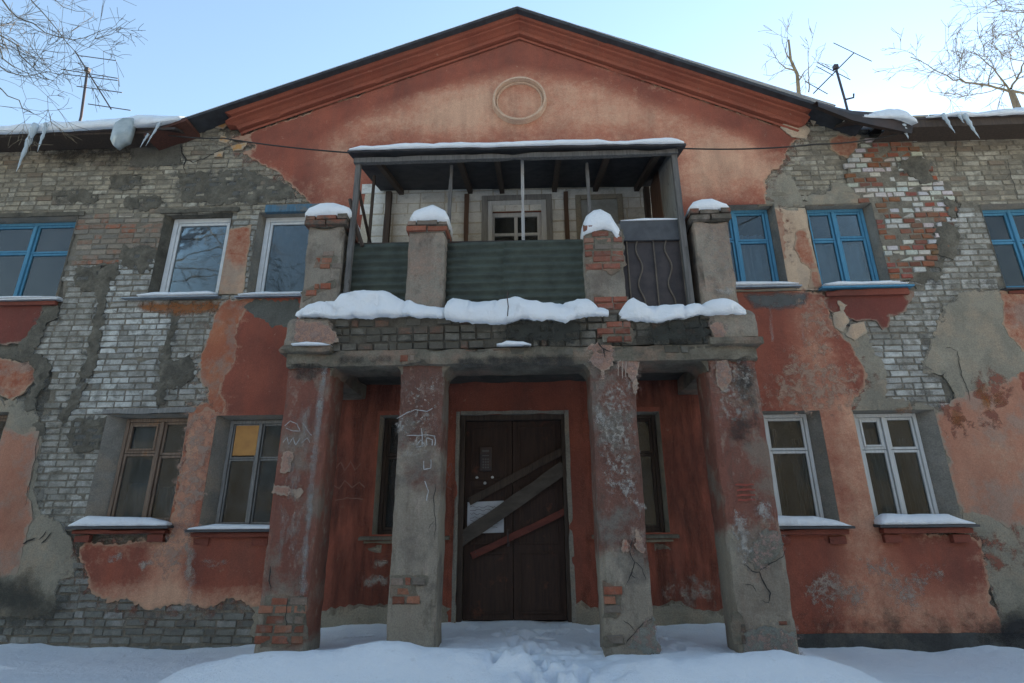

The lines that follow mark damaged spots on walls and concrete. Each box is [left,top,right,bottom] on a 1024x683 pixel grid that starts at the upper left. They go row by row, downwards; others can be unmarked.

spalling [583,225,627,275]
spalling [758,120,1024,439]
spalling [0,123,310,531]
spalling [587,294,643,509]
spalling [0,562,309,650]
spalling [389,574,428,605]
crack [627,538,646,582]
crack [744,548,787,603]